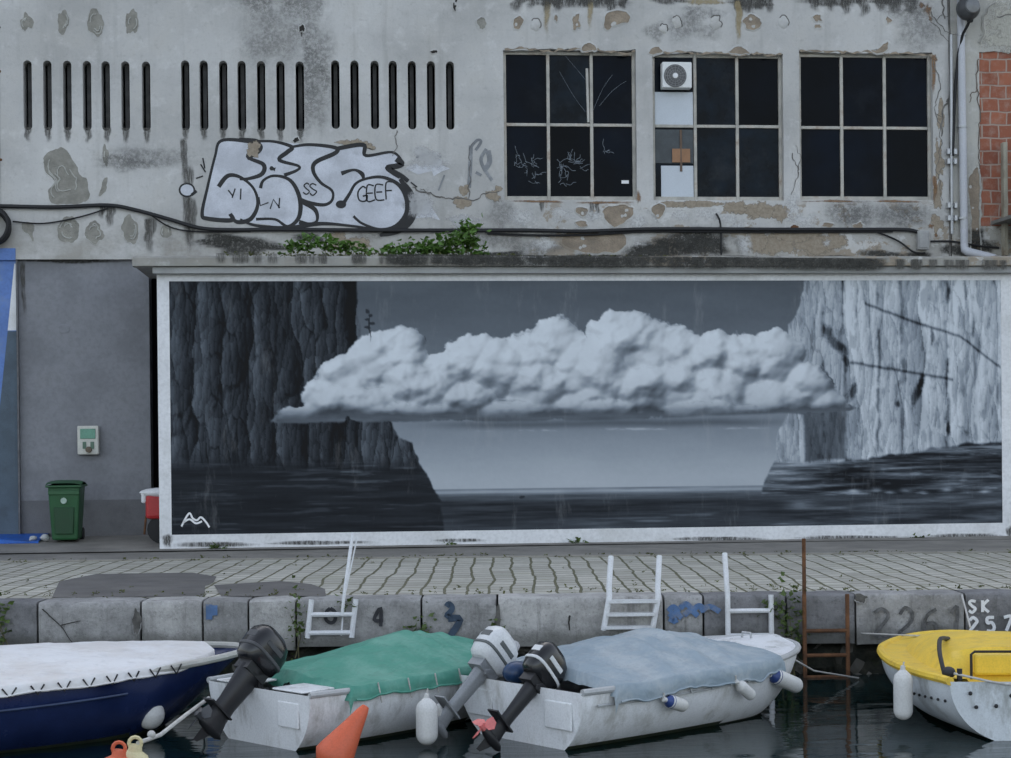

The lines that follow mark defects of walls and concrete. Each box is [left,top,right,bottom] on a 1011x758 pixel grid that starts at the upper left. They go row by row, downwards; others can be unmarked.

damp [809,0,918,13]
spalling [512,14,525,31]
spalling [552,12,582,32]
spalling [602,8,633,32]
spalling [741,12,764,32]
spalling [505,41,635,55]
spalling [647,45,782,57]
crack [931,0,981,256]
crack [413,143,499,201]
peeling [536,196,865,256]